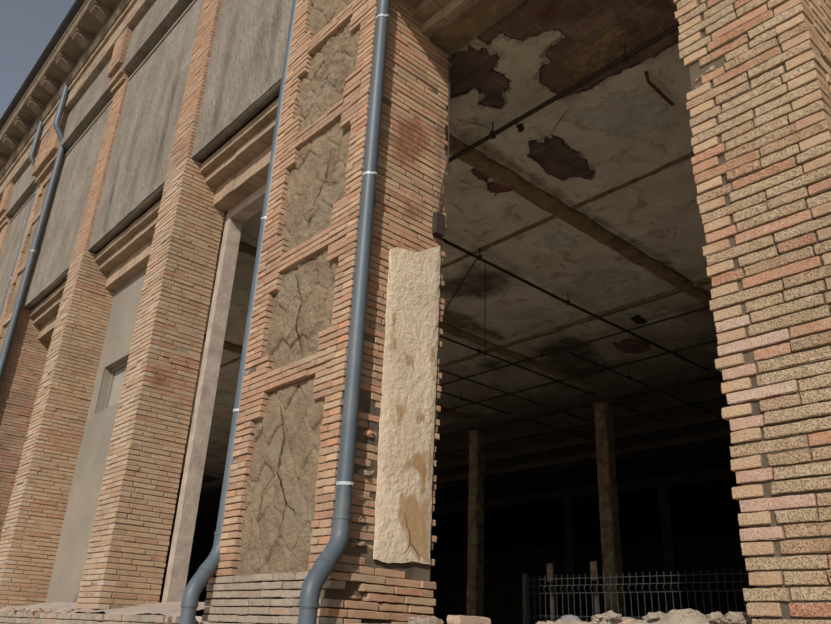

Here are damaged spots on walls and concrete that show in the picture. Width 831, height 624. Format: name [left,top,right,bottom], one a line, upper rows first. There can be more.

flaking render [448,0,680,109]
flaking render [527,135,596,182]
flaking render [471,168,513,196]
water stain [440,271,507,298]
water stain [406,453,430,492]
water stain [398,493,429,560]
spalling [536,610,749,624]